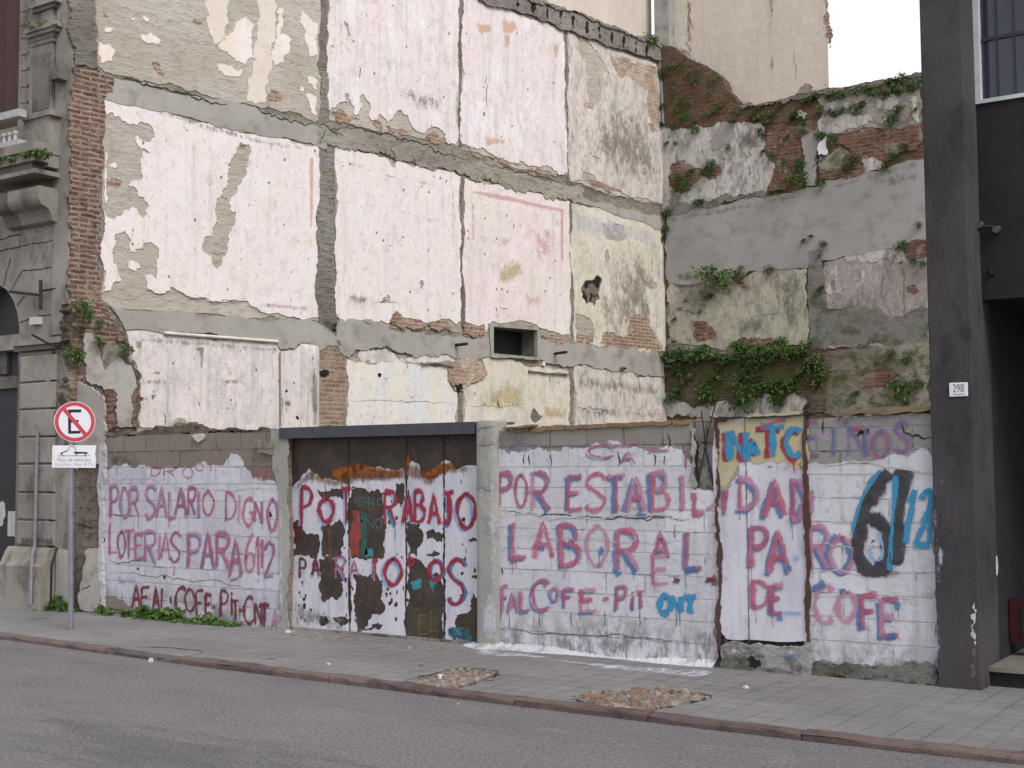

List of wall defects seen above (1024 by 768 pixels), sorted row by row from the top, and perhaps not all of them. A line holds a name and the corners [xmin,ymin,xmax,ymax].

flaking render [267,89,283,102]
flaking render [331,93,360,123]
flaking render [577,37,661,132]
flaking render [102,112,154,219]
flaking render [202,143,251,269]
flaking render [668,159,721,194]
flaking render [108,231,159,299]
flaking render [541,276,663,354]
rust [298,451,467,491]
peeling [293,481,477,642]
spalling [719,655,796,675]
peeling [969,604,978,678]